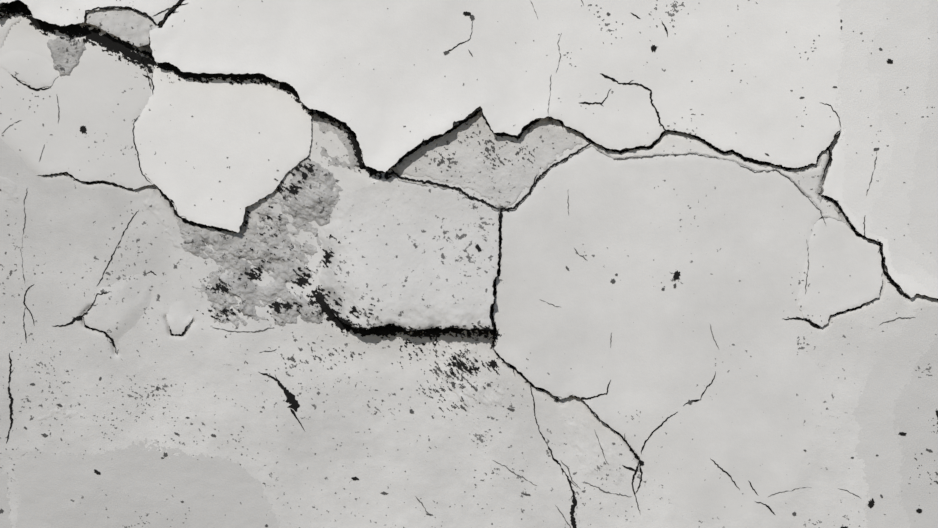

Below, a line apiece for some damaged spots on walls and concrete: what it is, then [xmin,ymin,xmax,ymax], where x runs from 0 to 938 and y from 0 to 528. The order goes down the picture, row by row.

peeling [76,274,152,353]
crack [6,115,239,443]
peeling [166,301,194,335]
crack [213,327,276,353]
peeling [0,0,938,329]
crack [315,35,938,528]
peeling [396,111,882,521]